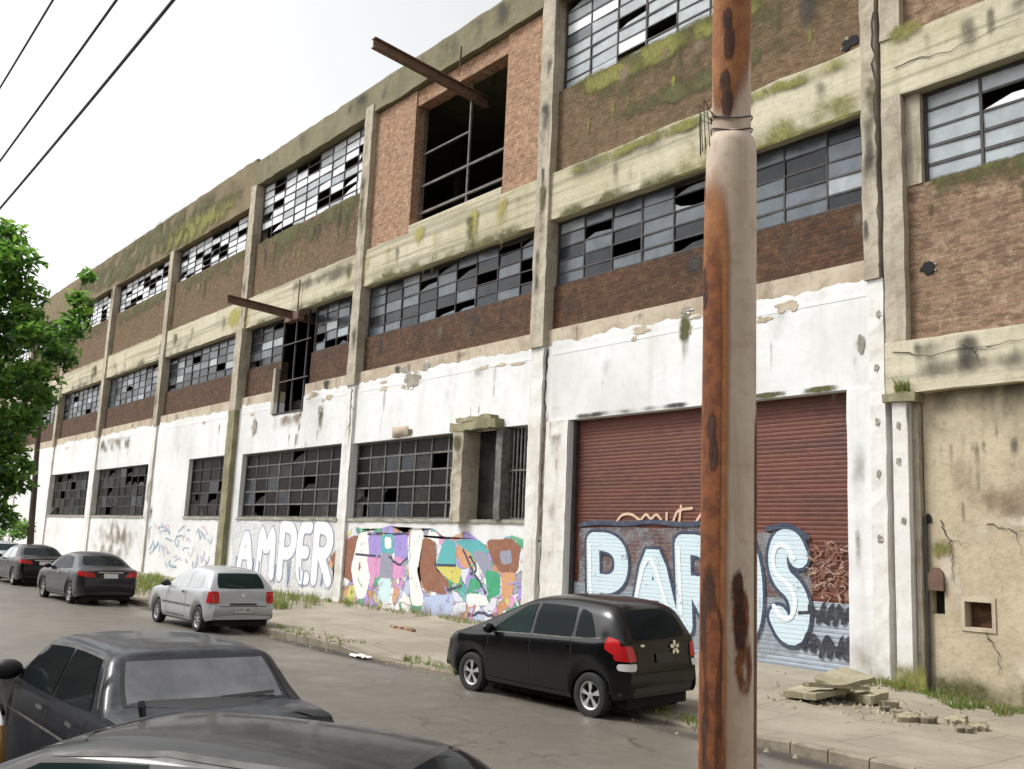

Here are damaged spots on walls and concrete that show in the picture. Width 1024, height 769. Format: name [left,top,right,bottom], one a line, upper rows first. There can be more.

rust [712,0,751,116]
crack [864,12,1020,274]
peeling [304,349,531,415]
peeling [552,306,703,356]
peeling [756,280,867,323]
crack [893,339,1023,362]
peeling [241,401,271,434]
rust [698,185,758,769]
crack [940,520,967,583]